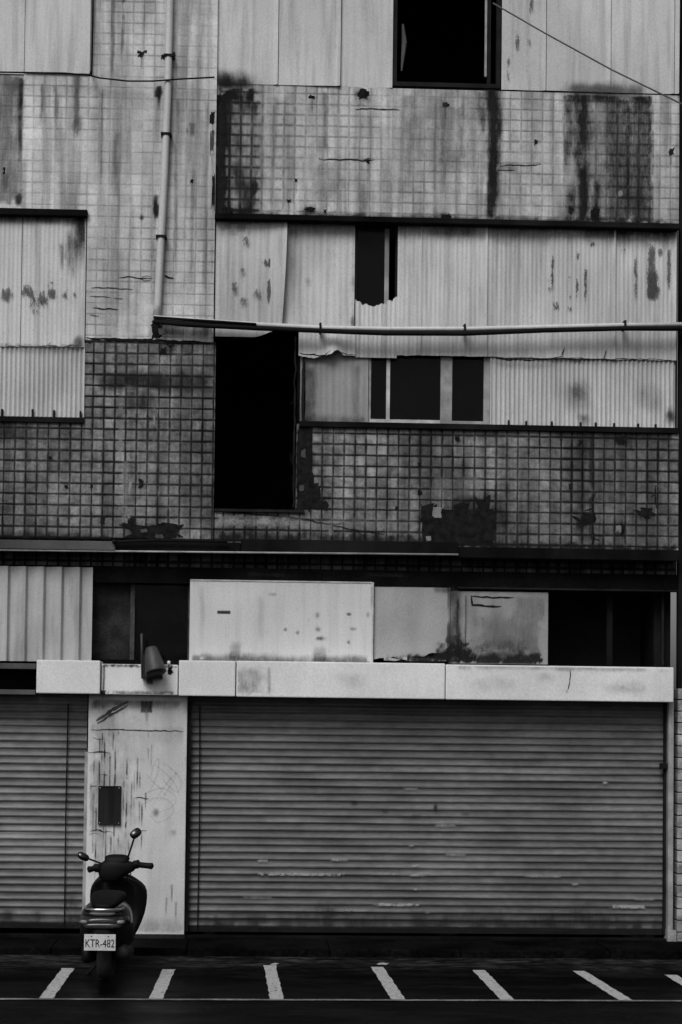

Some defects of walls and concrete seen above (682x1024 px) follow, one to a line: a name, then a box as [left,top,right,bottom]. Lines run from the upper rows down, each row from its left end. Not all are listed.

water stain [215,79,385,217]
water stain [450,83,673,235]
rust [1,282,76,313]
rust [231,268,271,304]
rust [624,244,671,299]
spalling [296,427,329,512]
spalling [119,516,184,539]
spalling [418,489,496,547]
water stain [400,587,543,664]